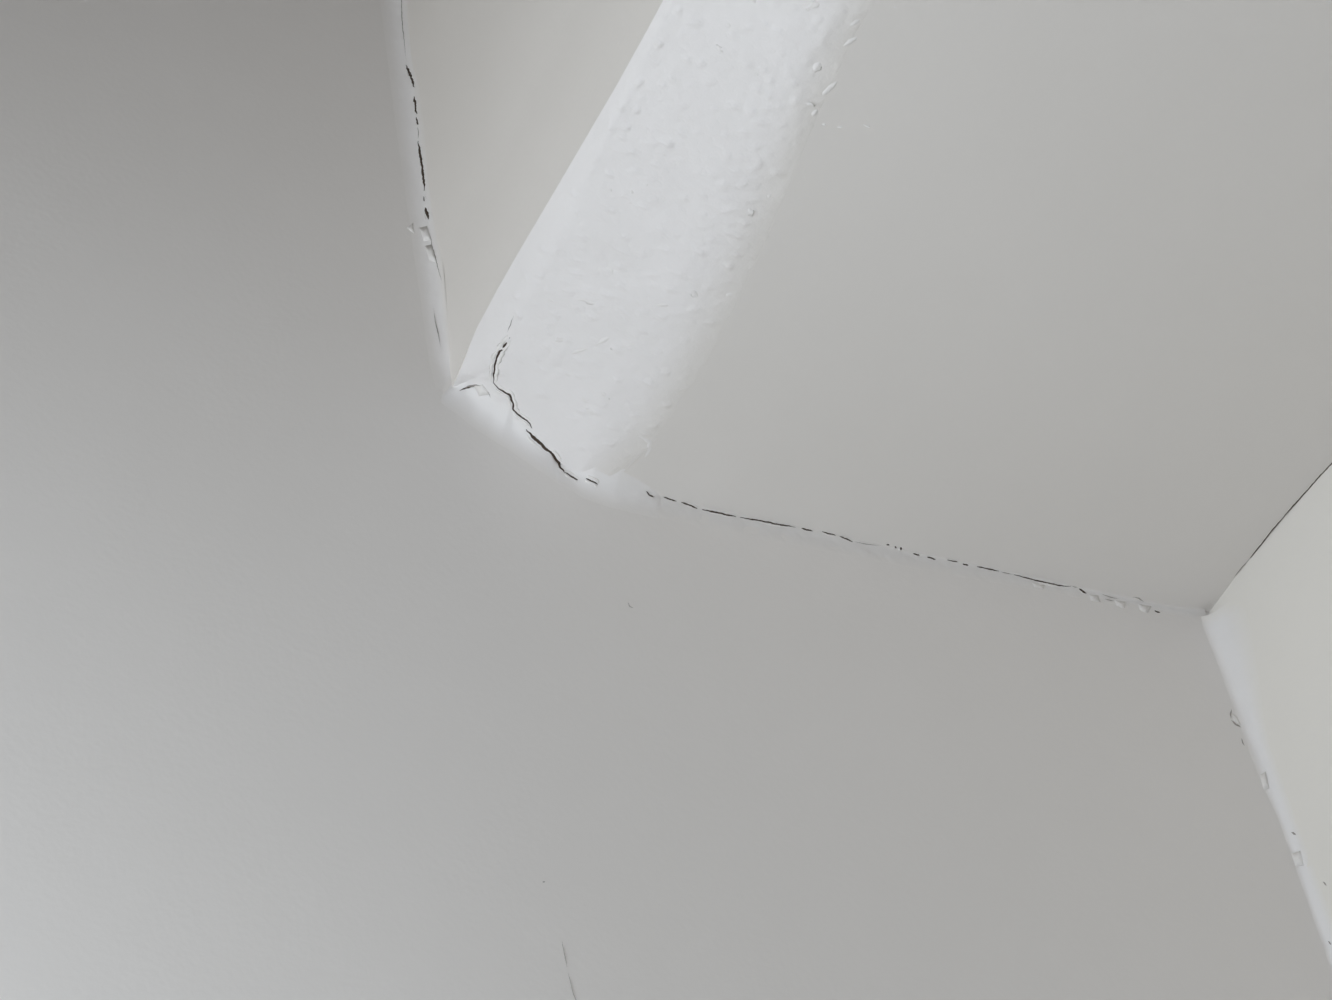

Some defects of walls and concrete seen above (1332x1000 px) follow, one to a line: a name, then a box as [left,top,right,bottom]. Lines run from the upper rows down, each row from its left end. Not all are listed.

crack [401,0,440,275]
crack [465,318,599,487]
crack [646,490,1160,614]